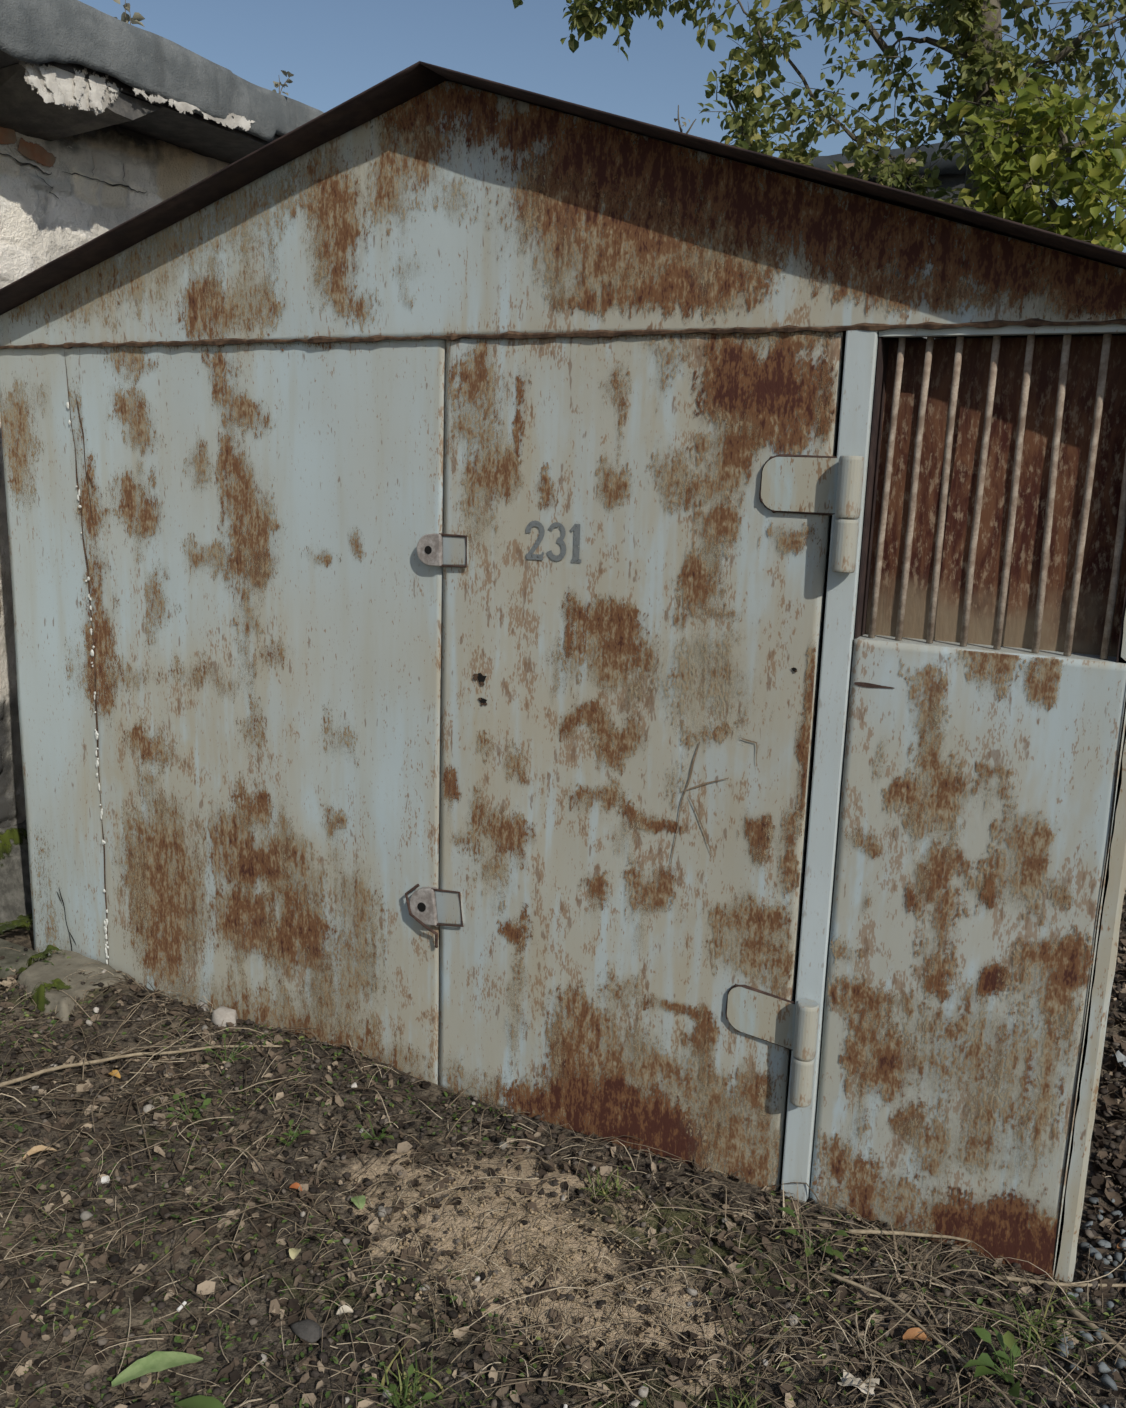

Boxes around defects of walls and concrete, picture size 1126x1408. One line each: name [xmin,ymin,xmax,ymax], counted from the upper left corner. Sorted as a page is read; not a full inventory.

spalling [18,60,255,131]
corrosion [0,376,47,510]
corrosion [9,81,1126,1191]